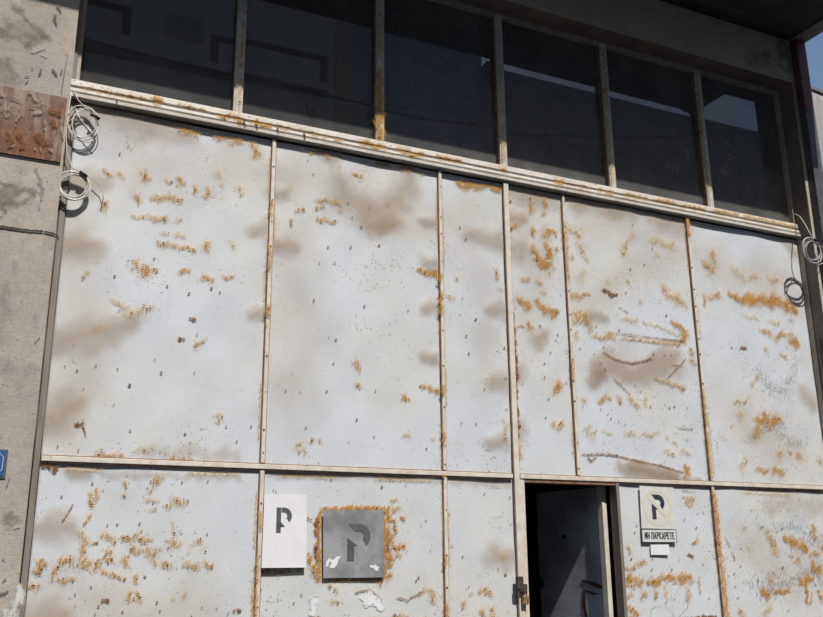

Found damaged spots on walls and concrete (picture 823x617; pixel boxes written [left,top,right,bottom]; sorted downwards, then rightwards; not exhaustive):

rust [178,103,291,133]
rust [358,68,388,149]
crack [0,205,59,241]
rust [625,192,798,269]
rust [513,197,697,371]
rust [660,264,800,358]
rust [513,312,541,460]
rust [545,385,746,617]
peeling [0,579,26,617]
rust [228,495,407,617]
rust [758,566,791,615]
rust [761,524,823,605]